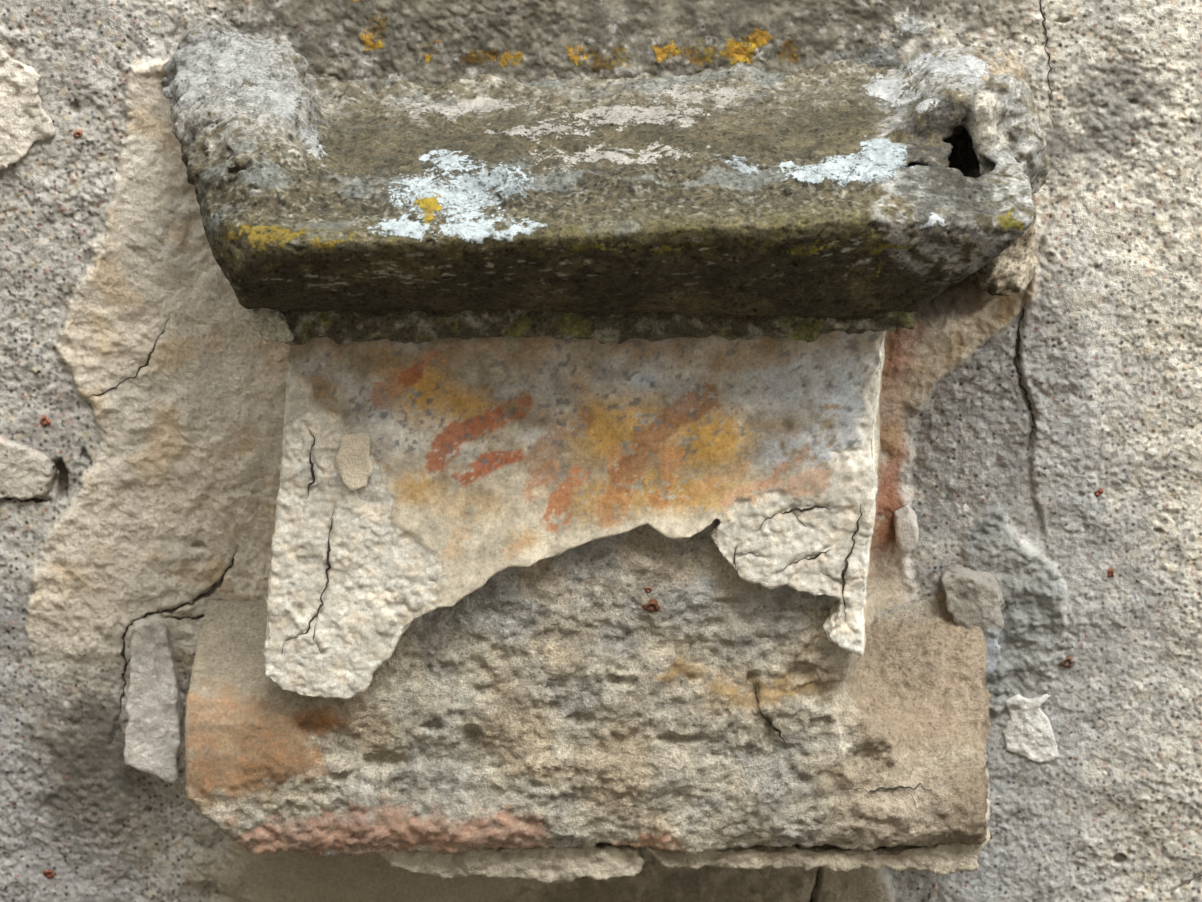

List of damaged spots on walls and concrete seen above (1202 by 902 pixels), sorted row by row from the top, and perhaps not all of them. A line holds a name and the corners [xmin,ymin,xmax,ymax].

crack [1039,0,1054,125]
crack [1013,298,1037,447]
spalling [642,586,661,612]
flaking render [712,471,878,657]